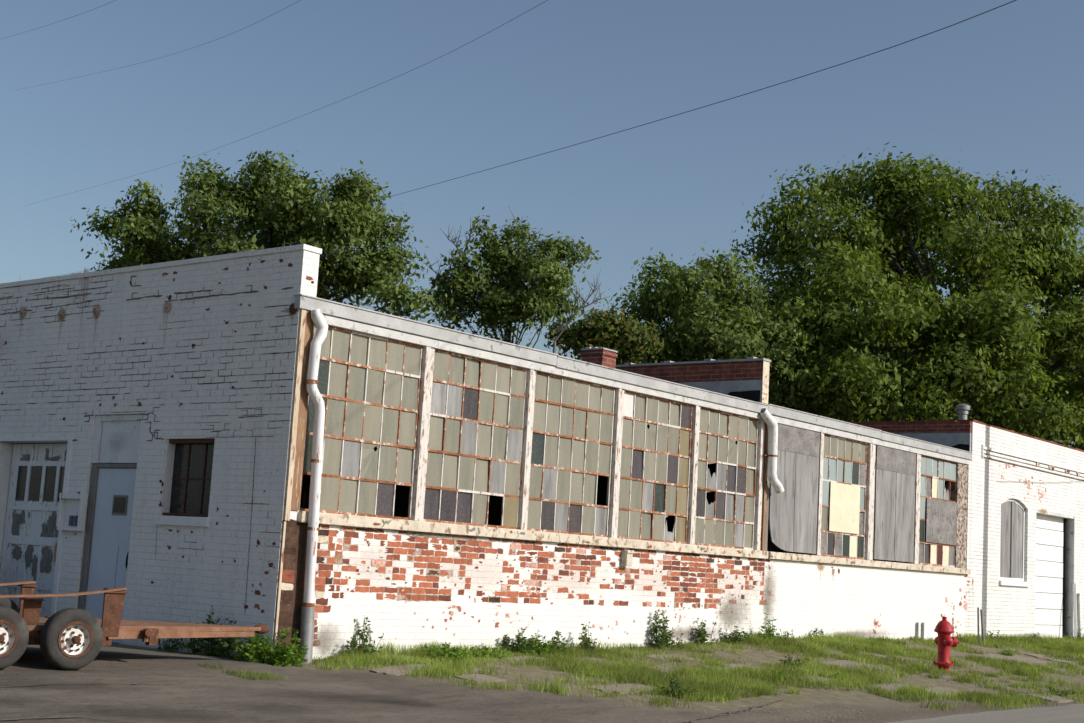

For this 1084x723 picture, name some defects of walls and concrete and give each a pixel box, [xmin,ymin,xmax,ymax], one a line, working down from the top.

peeling [1019,462,1081,502]
peeling [11,509,76,581]
peeling [243,519,771,656]